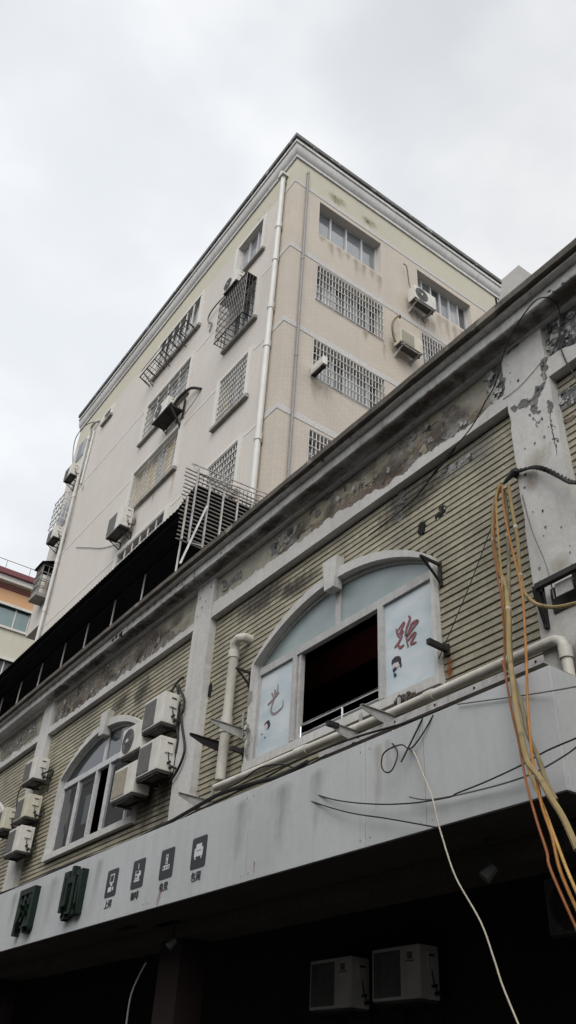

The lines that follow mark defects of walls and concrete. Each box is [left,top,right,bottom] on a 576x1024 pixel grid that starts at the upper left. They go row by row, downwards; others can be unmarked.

peeling [270,367,519,556]
peeling [510,306,576,449]